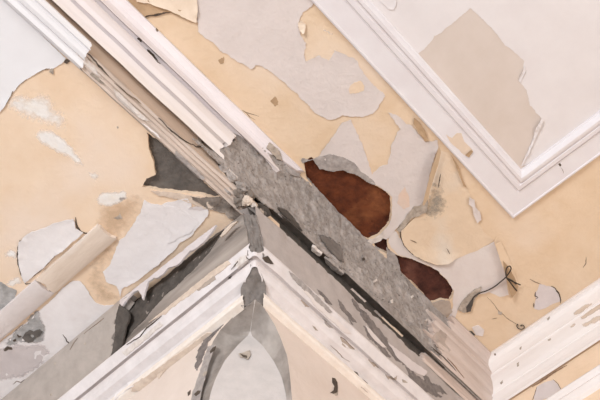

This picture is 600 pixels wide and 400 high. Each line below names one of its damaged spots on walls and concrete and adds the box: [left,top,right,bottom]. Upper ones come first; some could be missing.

peeling [0,0,70,112]
peeling [371,0,600,166]
peeling [0,88,273,400]
peeling [128,0,509,354]
peeling [530,279,561,310]